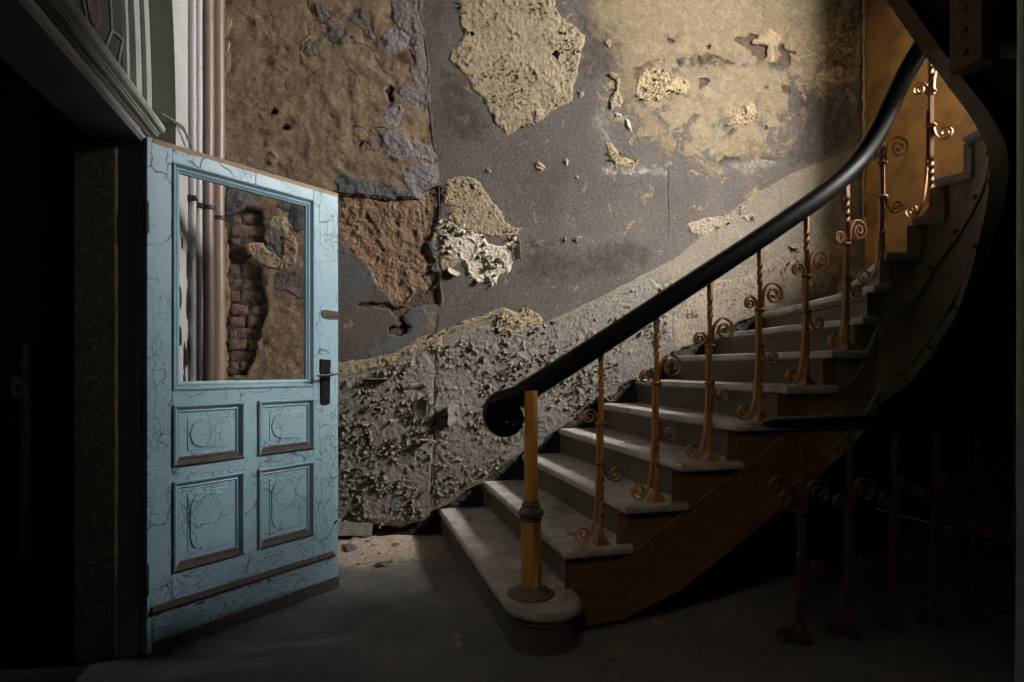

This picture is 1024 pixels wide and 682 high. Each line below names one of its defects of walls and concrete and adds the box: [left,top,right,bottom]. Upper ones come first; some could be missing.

peeling [224,16,232,76]
peeling [448,0,585,135]
peeling [634,68,709,102]
peeling [719,101,756,127]
flaking render [734,29,795,68]
peeling [686,204,756,237]
flaking render [224,209,268,377]
peeling [334,176,677,536]